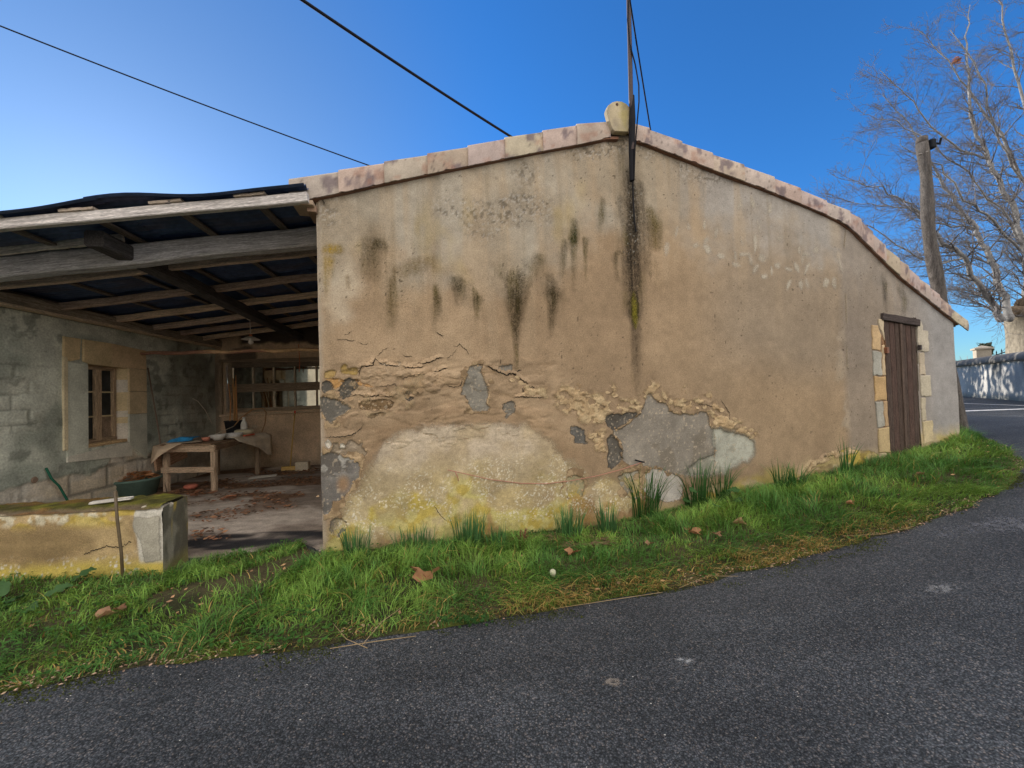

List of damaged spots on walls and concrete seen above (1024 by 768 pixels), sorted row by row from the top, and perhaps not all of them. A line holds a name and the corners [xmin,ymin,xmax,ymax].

crack [338,332,547,399]
water stain [508,279,523,355]
water stain [547,286,558,320]
water stain [624,172,660,350]
spalling [316,364,427,539]
water stain [326,422,648,552]
spalling [458,360,757,502]